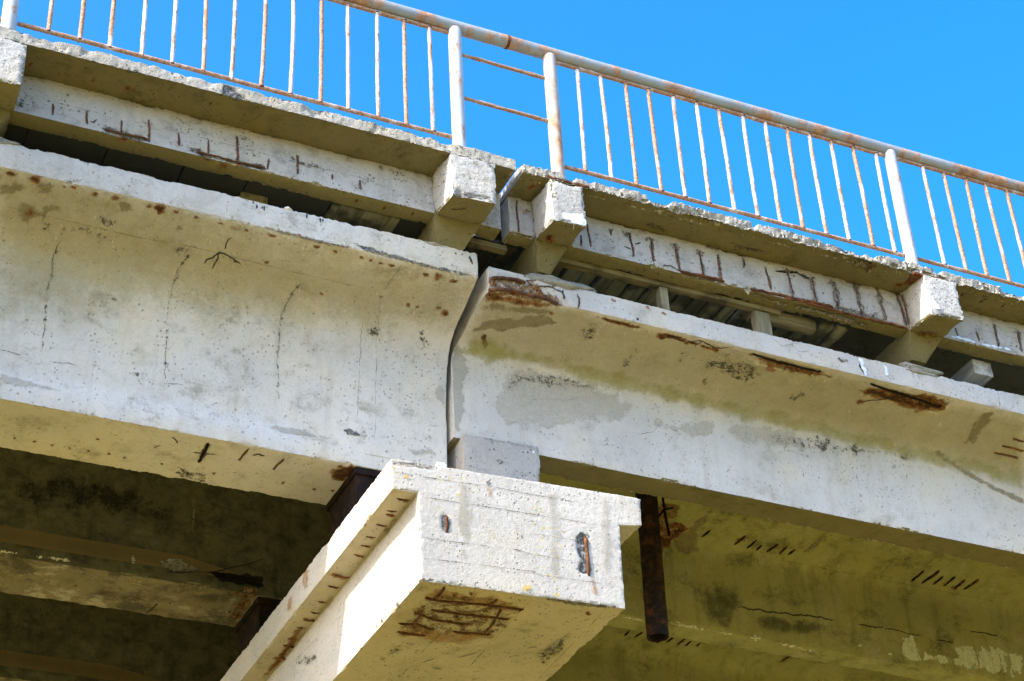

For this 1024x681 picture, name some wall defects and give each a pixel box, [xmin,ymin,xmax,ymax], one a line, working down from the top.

rust [147,204,178,215]
crack [167,238,241,314]
spalling [487,276,562,307]
rust [657,333,718,352]
rust [857,388,948,413]
water stain [20,480,168,519]
spalling [159,558,264,626]
spalling [397,587,524,637]
crack [737,606,833,621]